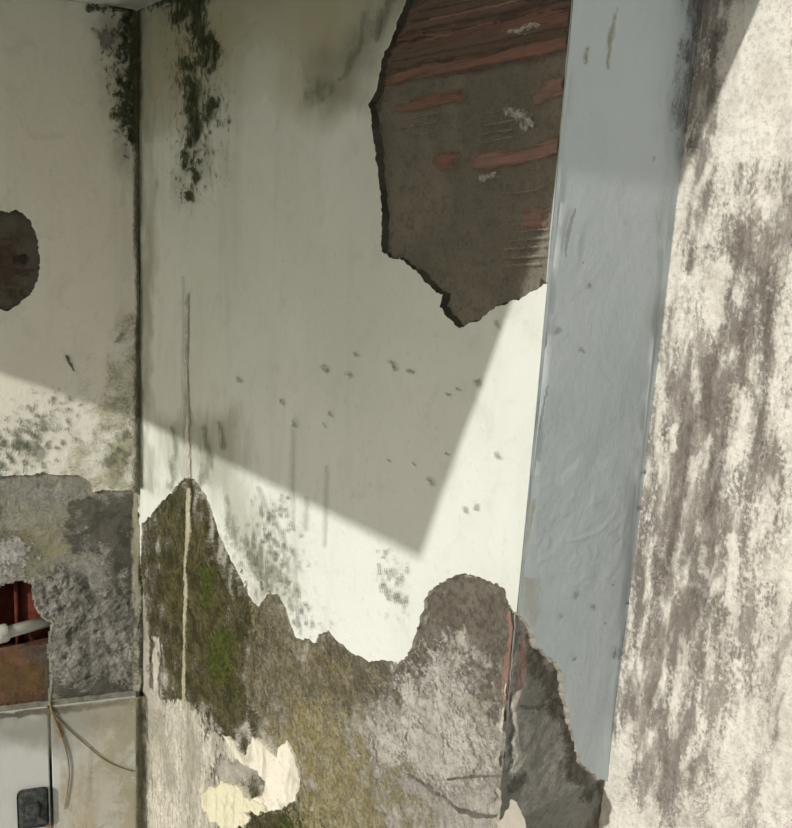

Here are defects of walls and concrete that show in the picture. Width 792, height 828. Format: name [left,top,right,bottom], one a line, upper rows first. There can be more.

spalling [0,210,40,311]
water stain [86,0,357,209]
spalling [368,0,573,329]
water stain [612,0,792,828]
water stain [0,388,162,828]
spalling [0,472,606,828]